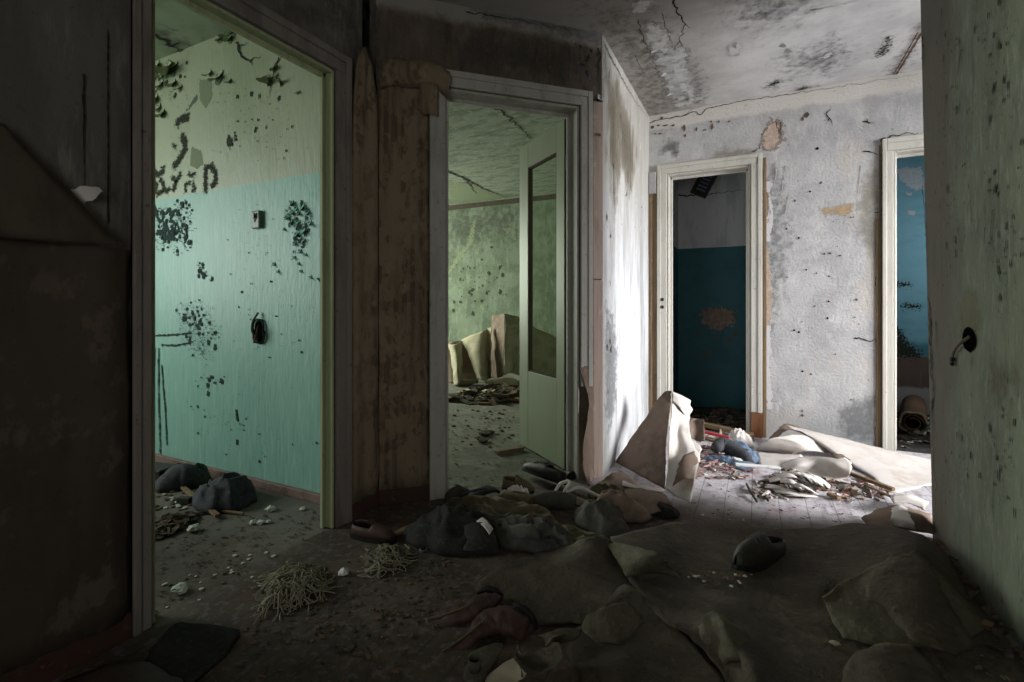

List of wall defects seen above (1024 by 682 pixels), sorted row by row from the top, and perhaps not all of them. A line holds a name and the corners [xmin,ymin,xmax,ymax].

peeling [215,30,235,44]
peeling [155,59,300,169]